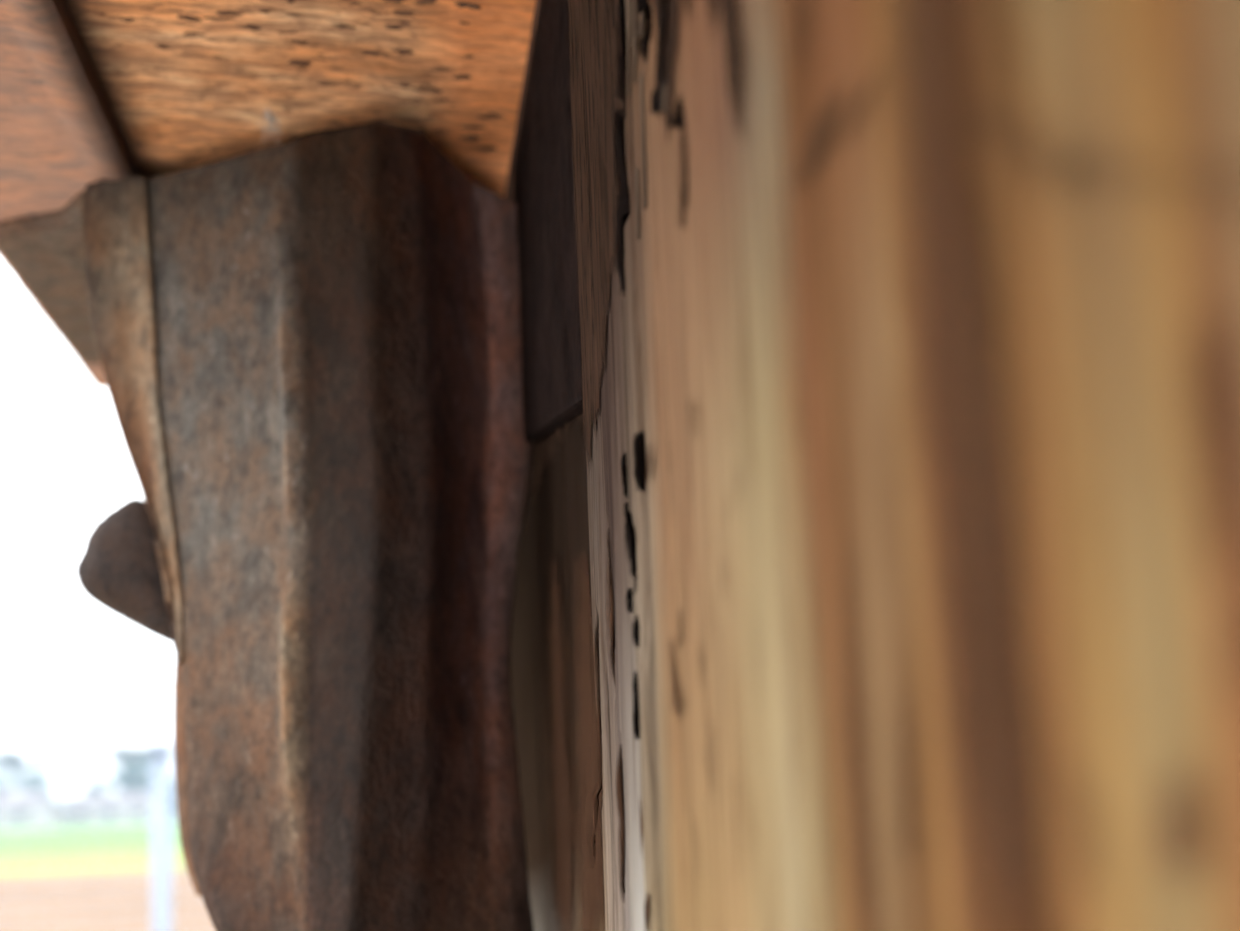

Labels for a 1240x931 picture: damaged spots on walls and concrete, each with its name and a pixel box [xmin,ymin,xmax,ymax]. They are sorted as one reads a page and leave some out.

peeling [651,0,689,143]
peeling [707,0,742,136]
peeling [520,0,627,543]